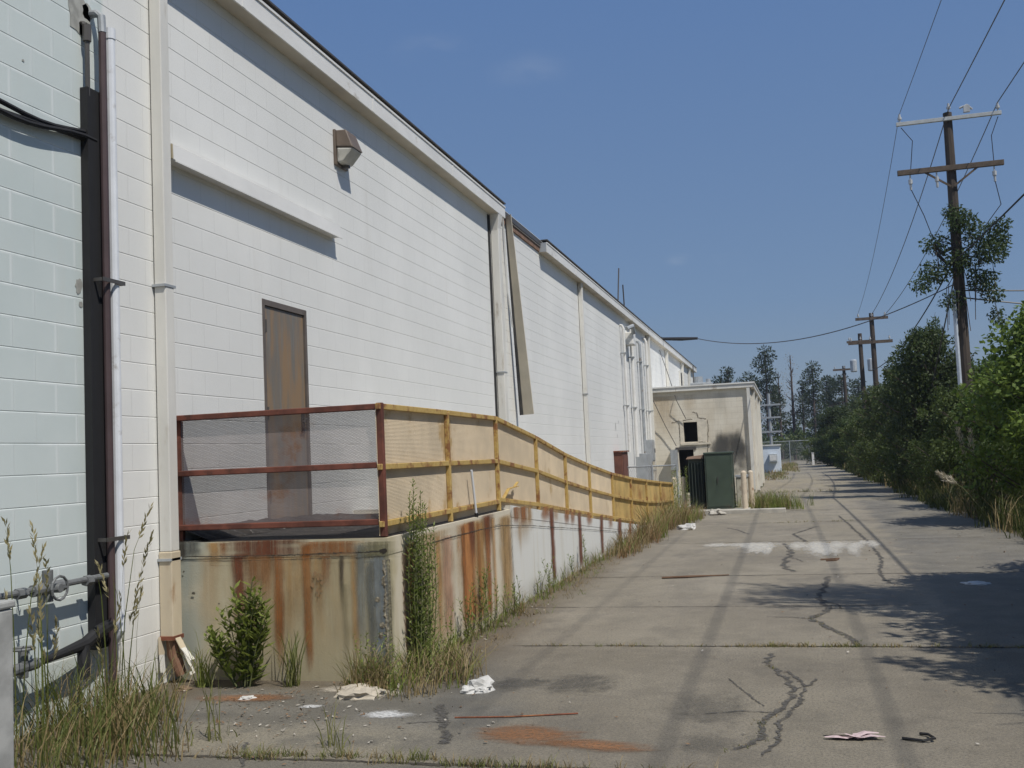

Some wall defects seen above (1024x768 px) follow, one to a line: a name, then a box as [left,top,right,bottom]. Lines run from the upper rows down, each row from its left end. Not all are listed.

corrosion [211,540,356,656]
corrosion [407,506,639,659]
crack [775,577,858,643]
crack [780,516,891,582]
crack [711,653,817,755]